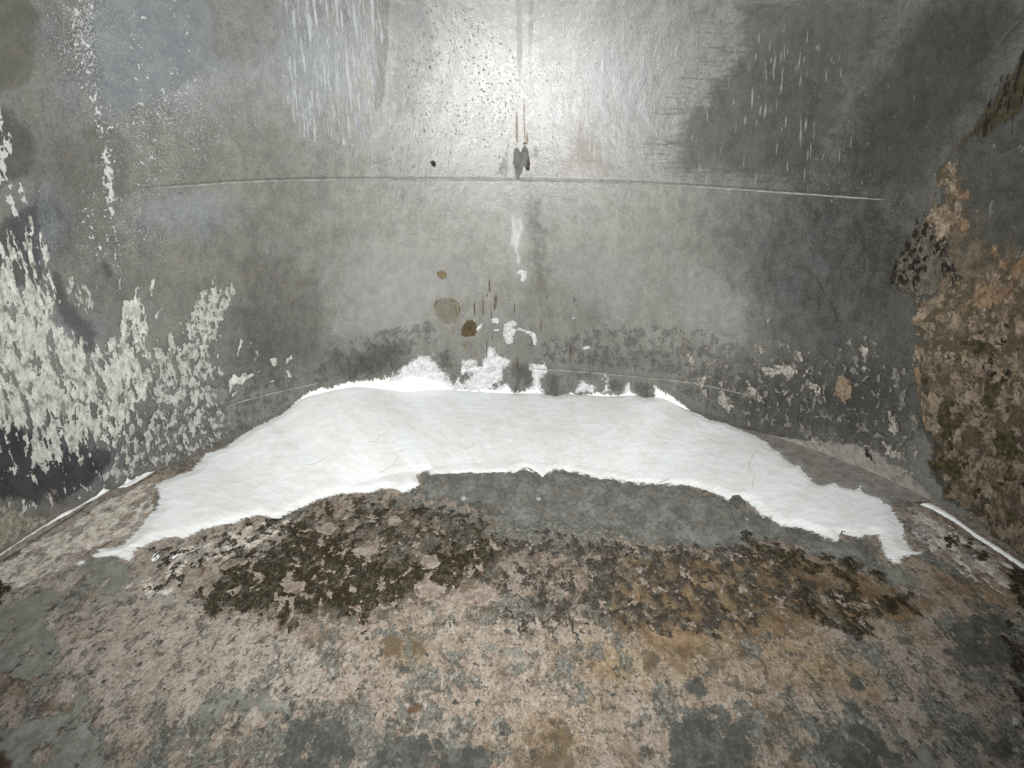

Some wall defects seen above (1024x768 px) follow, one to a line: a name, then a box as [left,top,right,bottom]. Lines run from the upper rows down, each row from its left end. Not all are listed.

leakage [513,146,530,180]
peeling [0,215,260,514]
leakage [438,349,472,384]
rust [453,281,497,356]
leakage [511,364,532,391]
peeling [675,102,1024,556]
leakage [749,430,932,505]